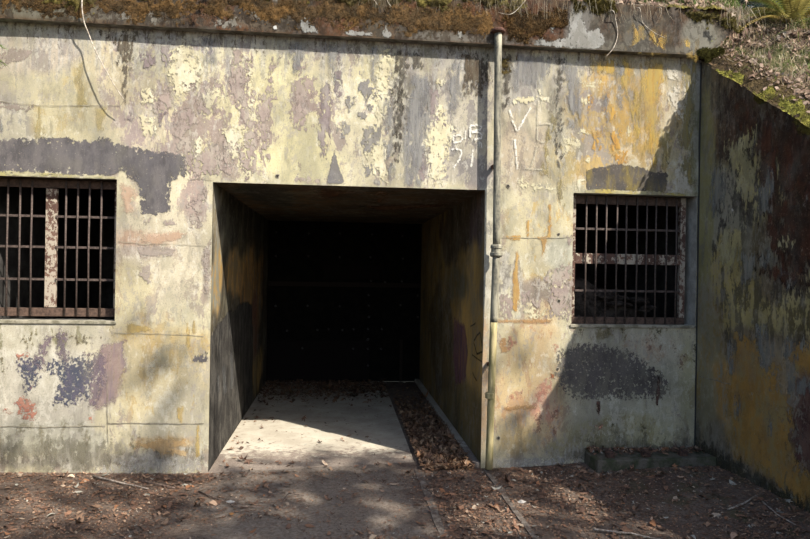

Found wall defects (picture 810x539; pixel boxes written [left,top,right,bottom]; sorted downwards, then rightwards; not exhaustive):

spalling [214,17,242,29]
spalling [301,18,317,33]
peeling [124,25,395,228]
peeling [418,75,458,186]
peeling [137,218,183,284]
damp [34,439,111,473]